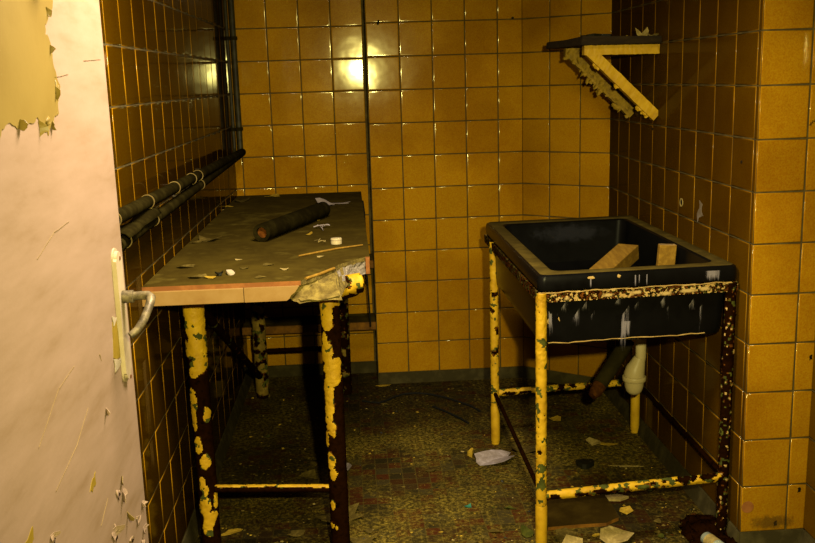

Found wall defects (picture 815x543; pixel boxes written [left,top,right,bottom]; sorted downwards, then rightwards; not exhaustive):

peeling [0,0,61,137]